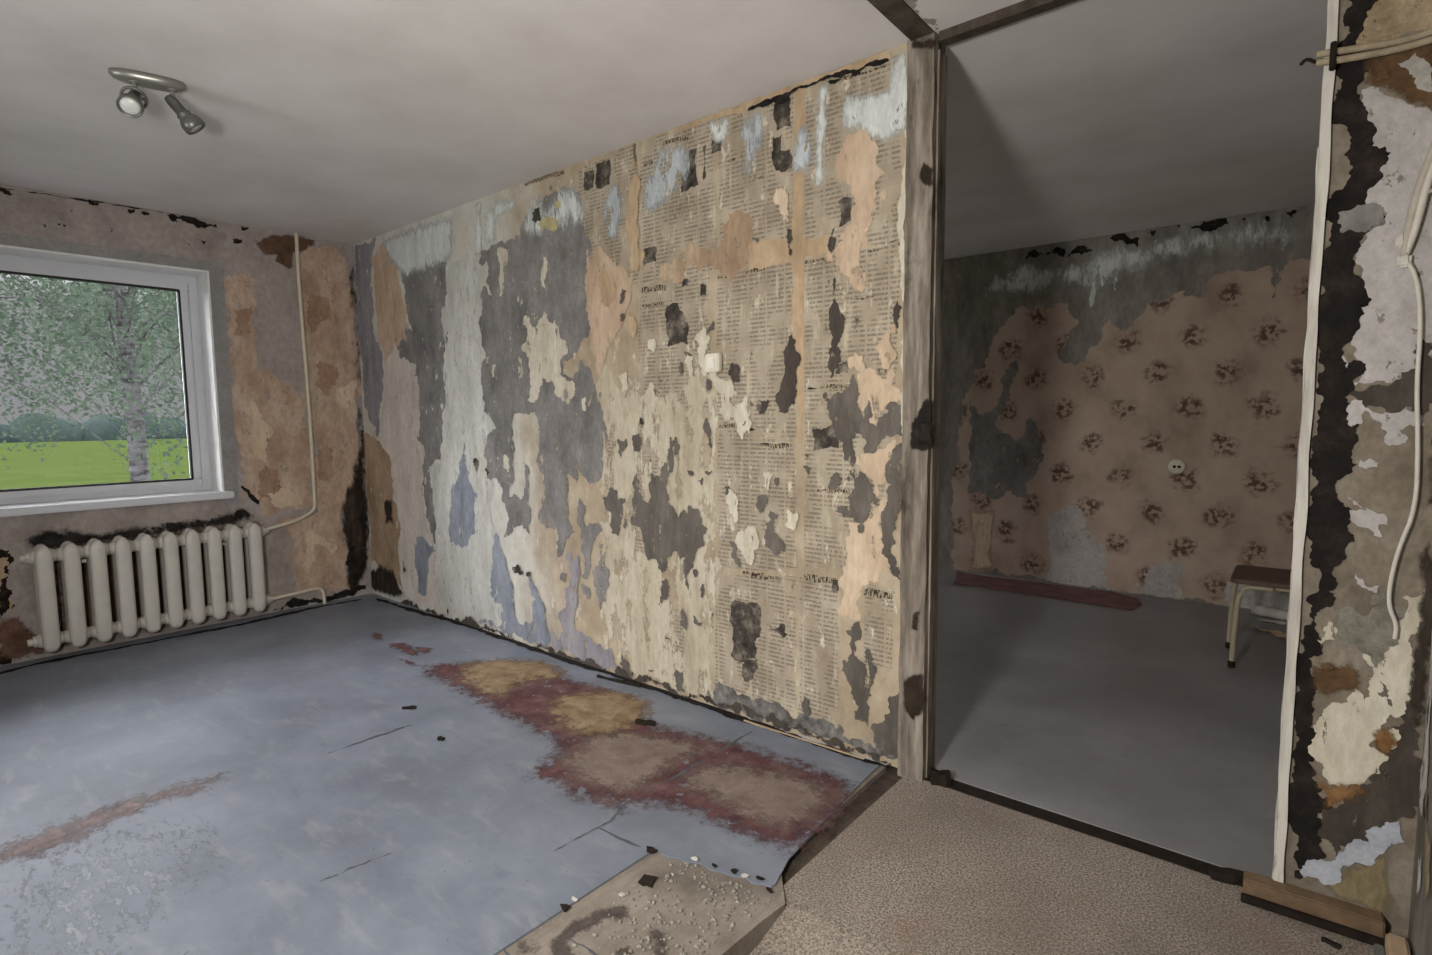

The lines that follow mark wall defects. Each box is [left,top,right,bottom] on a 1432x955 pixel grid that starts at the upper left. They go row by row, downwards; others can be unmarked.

peeling [167,214,217,245]
peeling [1025,245,1093,259]
peeling [1110,230,1156,247]
peeling [1177,218,1246,232]
flaking render [1338,190,1386,233]
flaking render [1342,339,1432,446]
peeling [243,401,303,509]
peeling [1357,458,1378,469]
flaking render [315,186,902,853]
peeling [1344,498,1388,537]
flaking render [0,549,15,618]
flaking render [1317,575,1426,857]